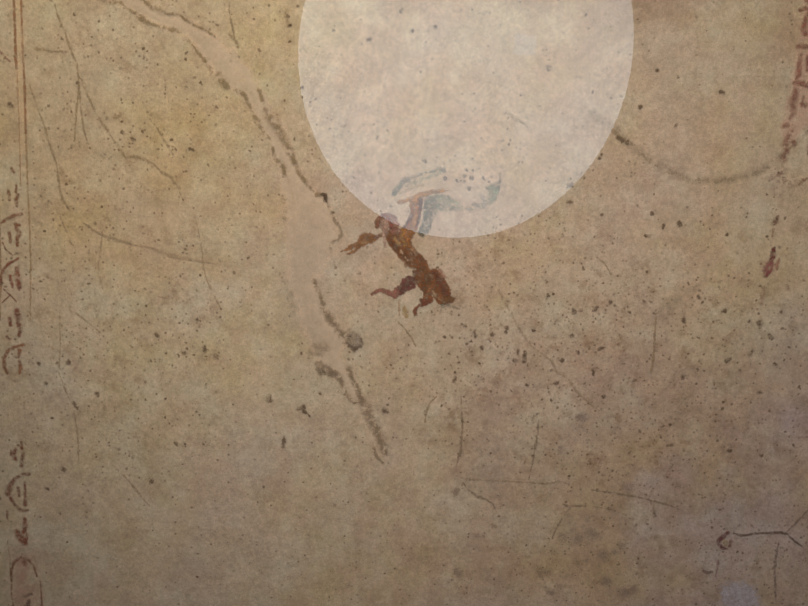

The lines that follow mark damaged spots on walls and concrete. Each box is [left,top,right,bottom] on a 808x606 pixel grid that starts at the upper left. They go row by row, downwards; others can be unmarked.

crack [37,0,175,183]
crack [115,0,387,463]